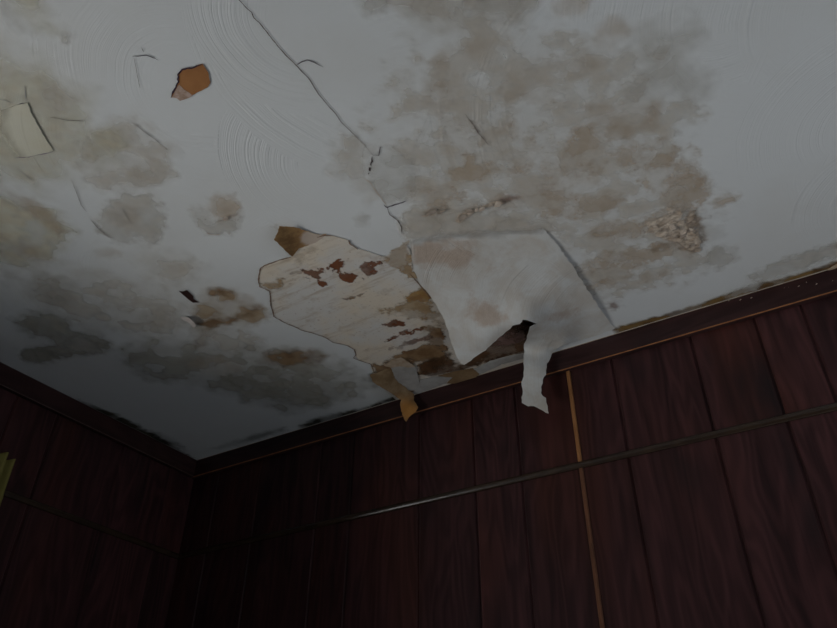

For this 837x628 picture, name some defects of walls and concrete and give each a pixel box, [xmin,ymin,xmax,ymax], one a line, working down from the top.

peeling [2,103,53,157]
leakage [0,73,79,178]
peeling [171,64,210,101]
crack [239,0,405,233]
leakage [391,0,729,296]
leakage [18,314,109,361]
leakage [209,288,235,301]
leakage [197,305,265,328]
peeling [258,235,536,395]
leakage [129,340,335,410]